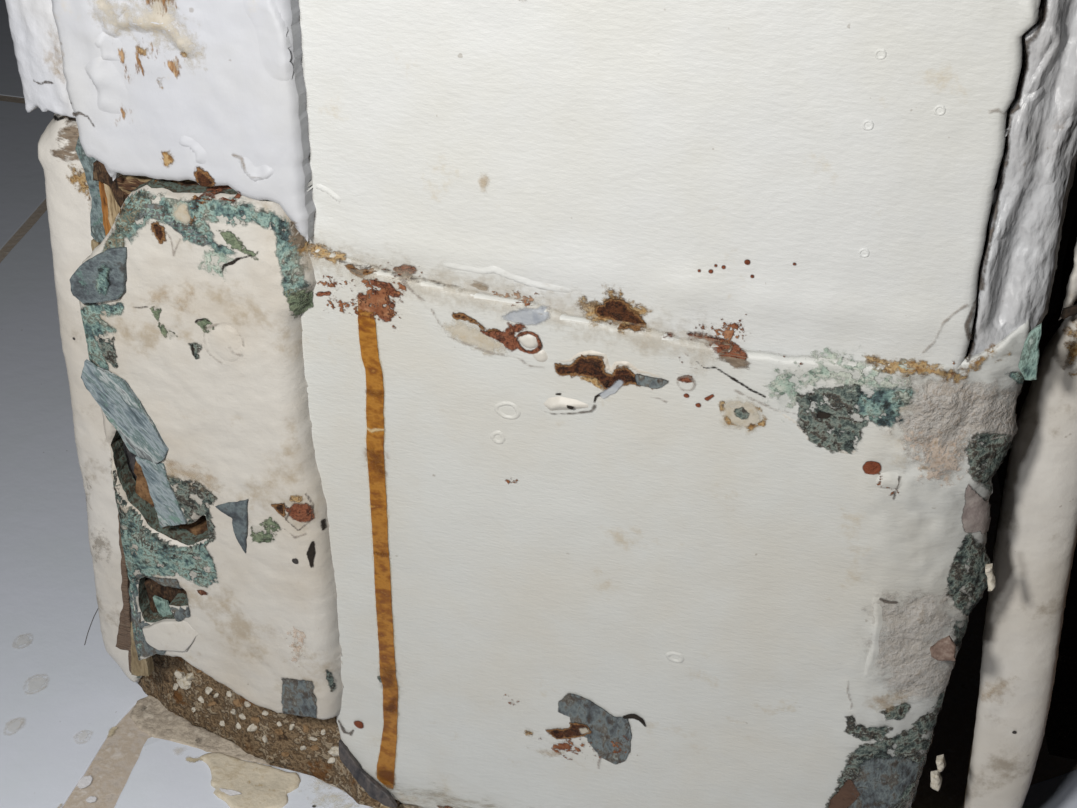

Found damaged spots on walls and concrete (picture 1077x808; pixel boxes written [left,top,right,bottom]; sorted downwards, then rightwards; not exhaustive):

corrosion [118,46,153,79]
corrosion [167,52,187,77]
peeling [70,247,127,304]
crack [309,250,454,292]
corrosion [688,314,749,368]
peeling [1018,323,1042,380]
corrosion [677,355,714,407]
peeling [81,337,187,528]
corrosion [68,137,422,789]
peeling [215,499,248,554]
peeling [271,495,315,538]
peeling [540,693,646,764]